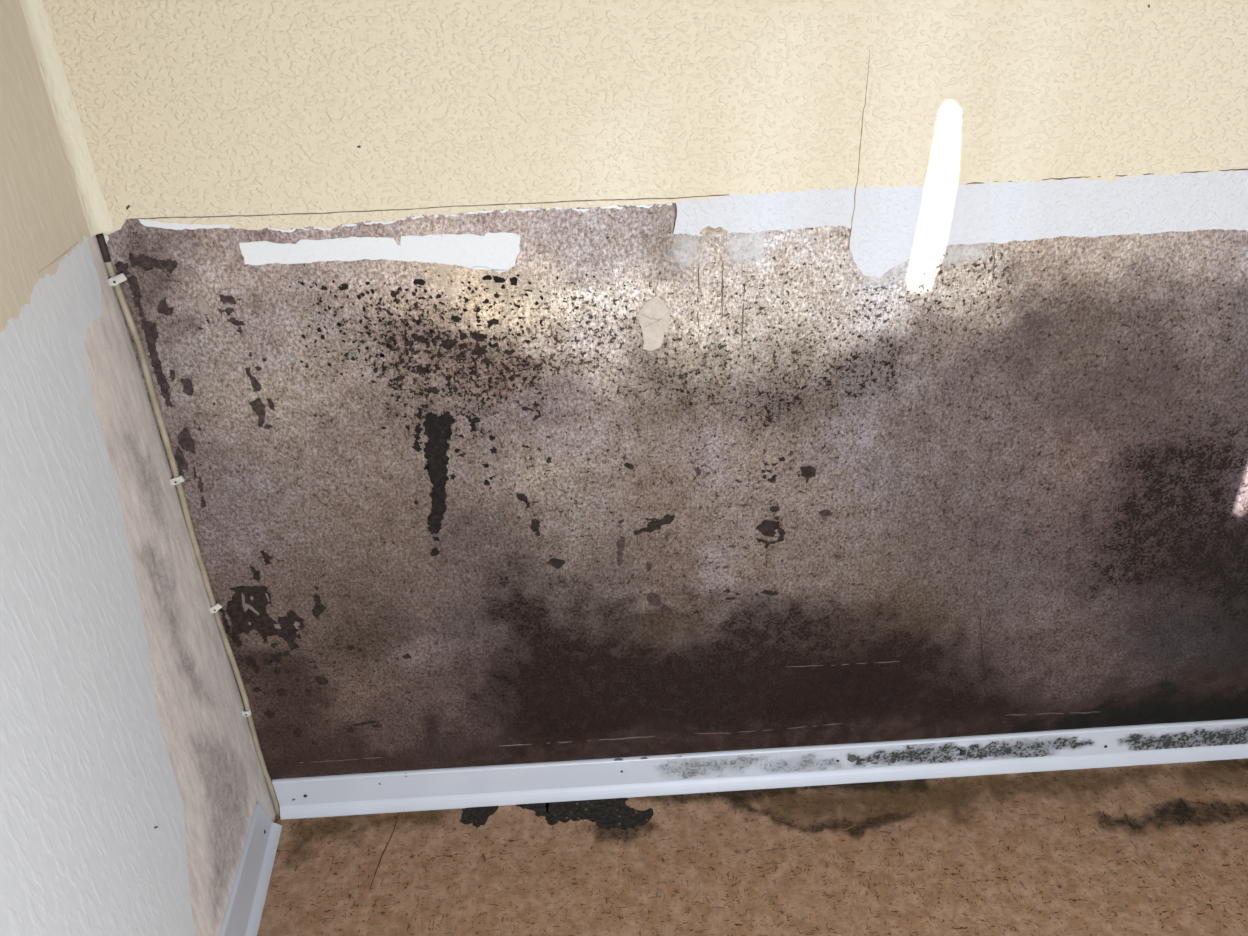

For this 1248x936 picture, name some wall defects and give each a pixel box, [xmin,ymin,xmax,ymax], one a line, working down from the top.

water stain [115,236,194,407]
water stain [197,294,245,334]
water stain [174,426,206,508]
water stain [220,253,1248,784]
peeling [84,203,1248,936]
water stain [287,818,351,862]
water stain [367,810,443,826]
water stain [460,806,499,828]
water stain [516,768,1155,841]
water stain [1098,799,1248,833]